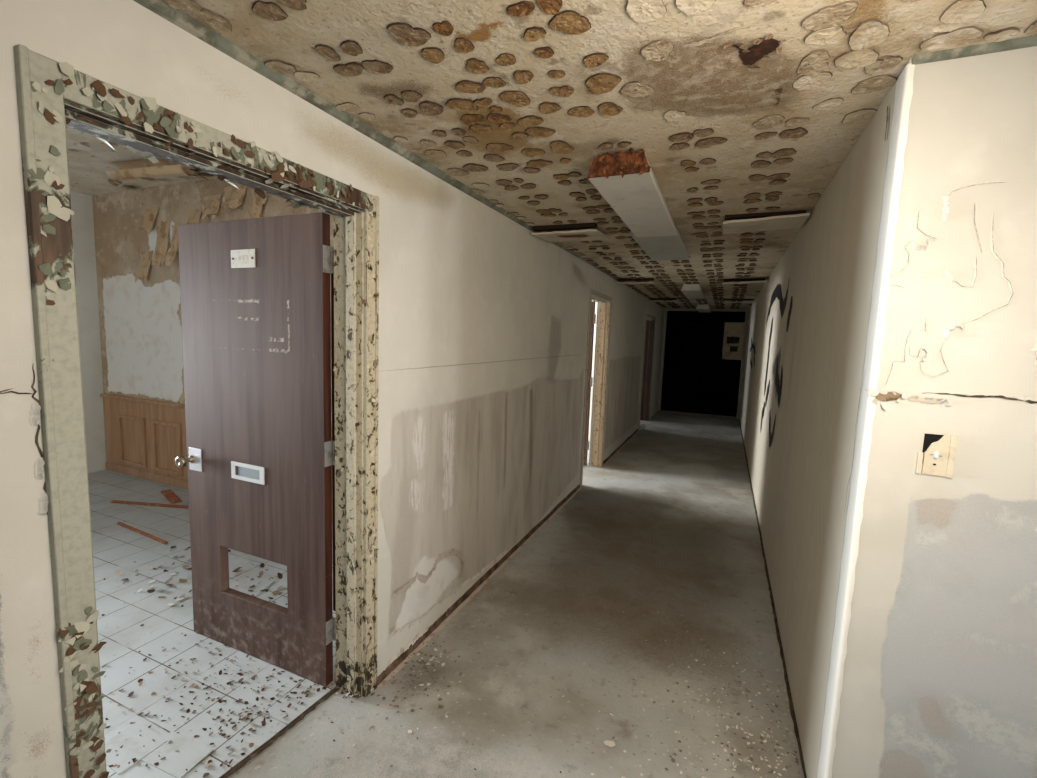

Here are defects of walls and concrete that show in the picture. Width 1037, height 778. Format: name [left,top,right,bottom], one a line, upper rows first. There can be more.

peeling [868,203,1014,410]
crack [0,363,49,516]
crack [936,390,1037,404]